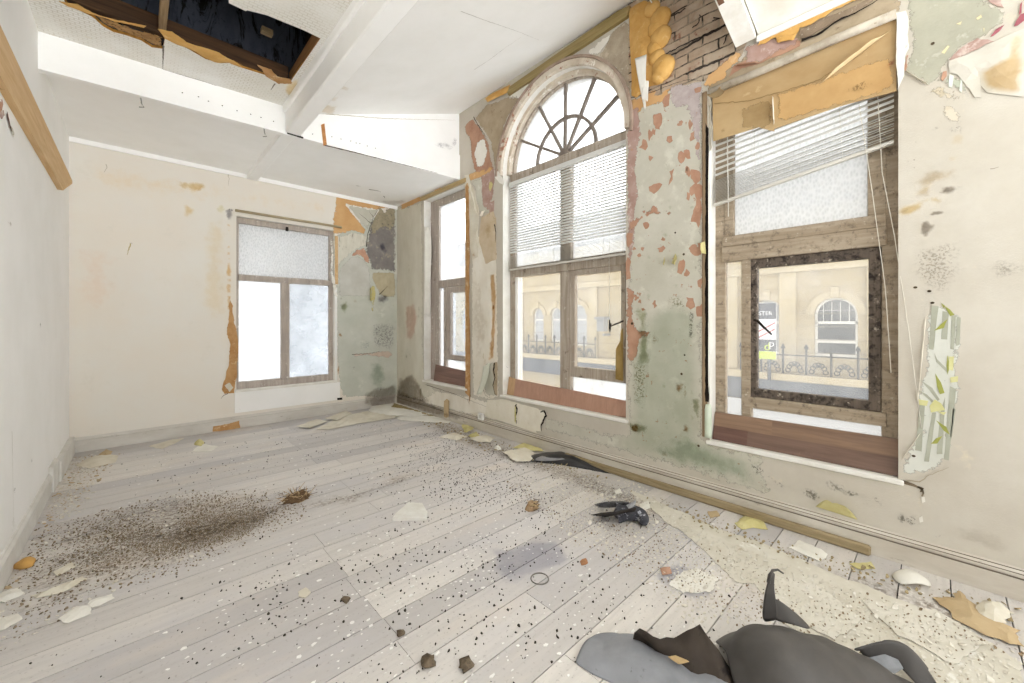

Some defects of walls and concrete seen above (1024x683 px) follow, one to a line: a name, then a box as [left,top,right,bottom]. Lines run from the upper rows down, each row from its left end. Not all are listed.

flaking render [465,85,518,214]
flaking render [545,0,1024,493]
peeling [222,301,238,394]
flaking render [337,202,435,400]
spalling [476,362,498,397]
crack [514,404,547,426]
crack [899,467,949,497]